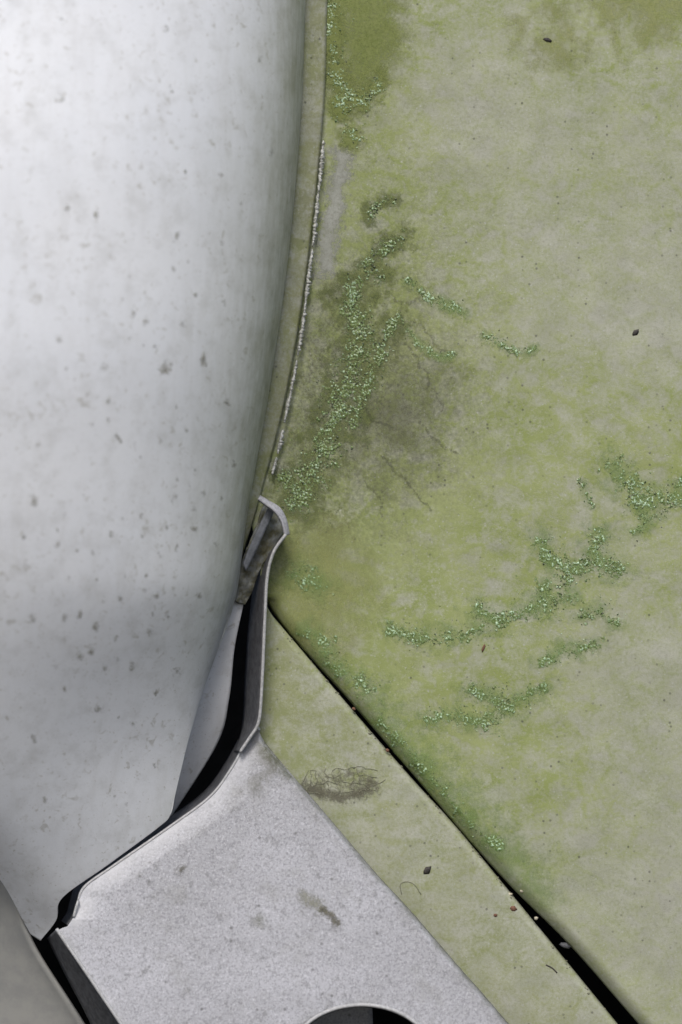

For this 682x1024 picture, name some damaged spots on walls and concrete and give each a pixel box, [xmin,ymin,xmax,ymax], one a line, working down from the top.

water stain [313,146,354,279]